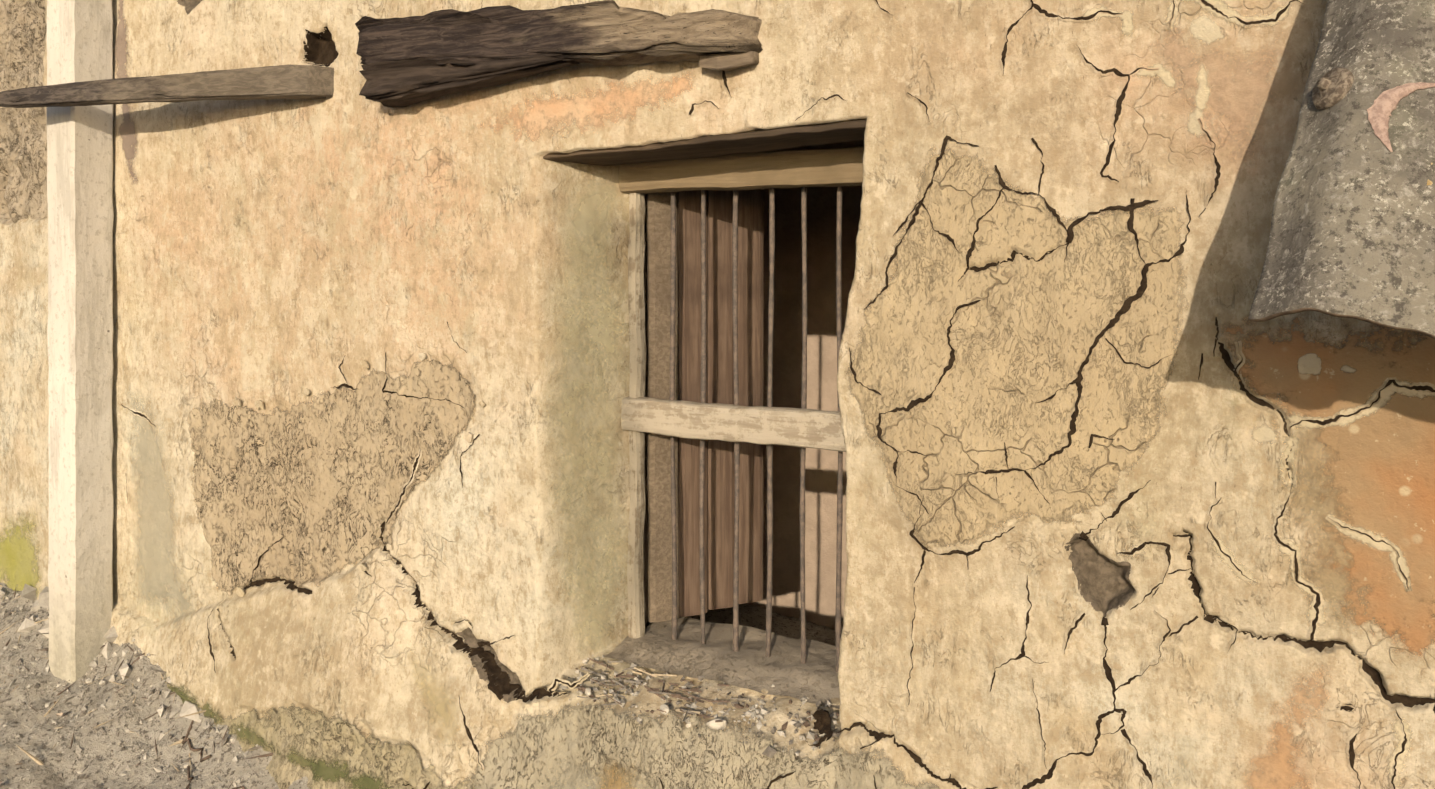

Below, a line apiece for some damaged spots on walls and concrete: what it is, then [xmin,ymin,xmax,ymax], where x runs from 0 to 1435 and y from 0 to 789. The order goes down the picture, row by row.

spalling [177,0,202,15]
spalling [303,26,338,67]
crack [687,70,733,116]
spalling [187,353,486,597]
crack [331,352,480,487]
crack [767,0,1435,789]
peeling [1226,317,1435,655]
crack [207,537,312,673]
crack [362,449,590,771]
spalling [1064,533,1135,618]
spalling [216,628,939,789]